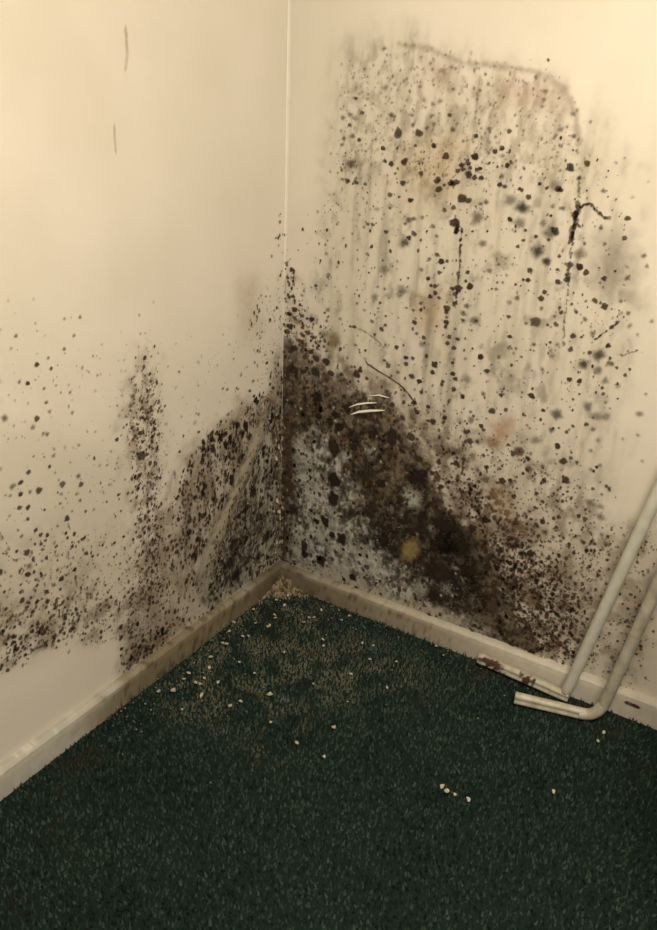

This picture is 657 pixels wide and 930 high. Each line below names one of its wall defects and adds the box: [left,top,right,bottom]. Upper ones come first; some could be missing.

damp [0,123,631,673]
corrosion [479,657,505,674]
damp [582,580,646,673]